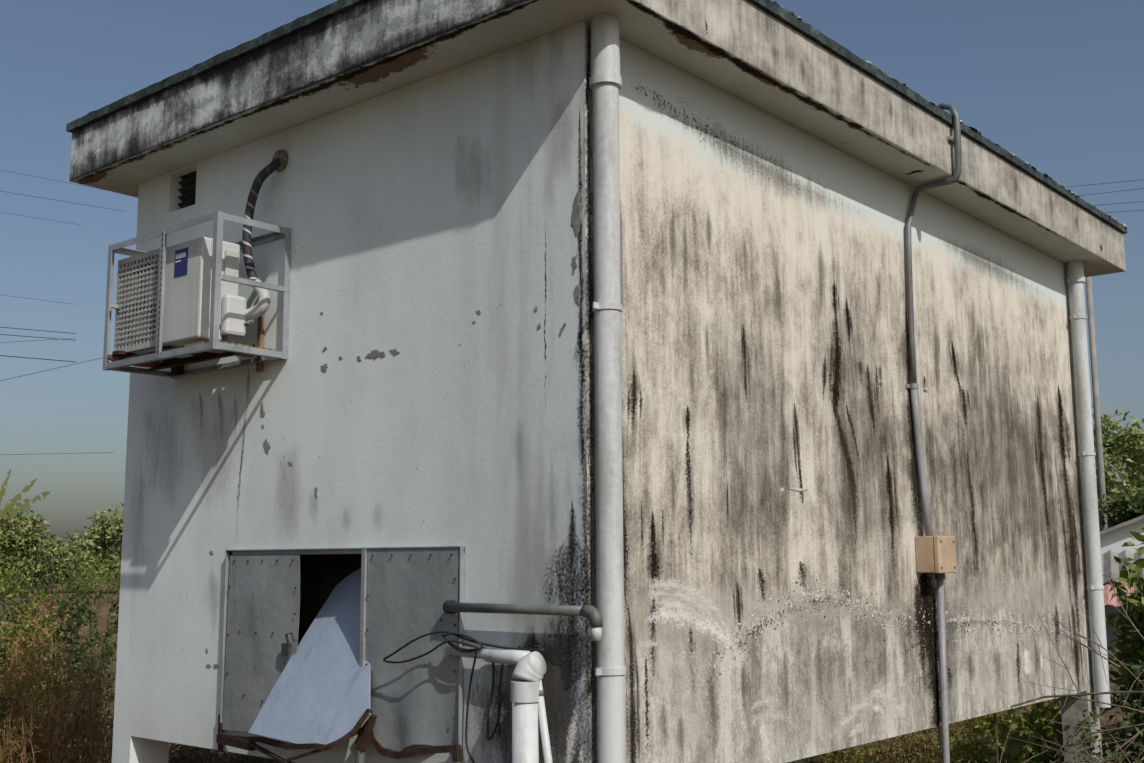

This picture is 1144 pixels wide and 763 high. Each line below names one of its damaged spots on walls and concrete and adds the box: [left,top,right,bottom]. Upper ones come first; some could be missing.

damp [78,0,538,185]
damp [631,85,822,198]
damp [626,0,932,167]
damp [958,181,1064,239]
peeling [357,348,400,361]
damp [523,27,596,763]
damp [741,329,750,401]
damp [819,260,861,544]
damp [882,309,935,557]
damp [935,338,970,425]
damp [622,363,1083,763]
damp [481,665,513,763]